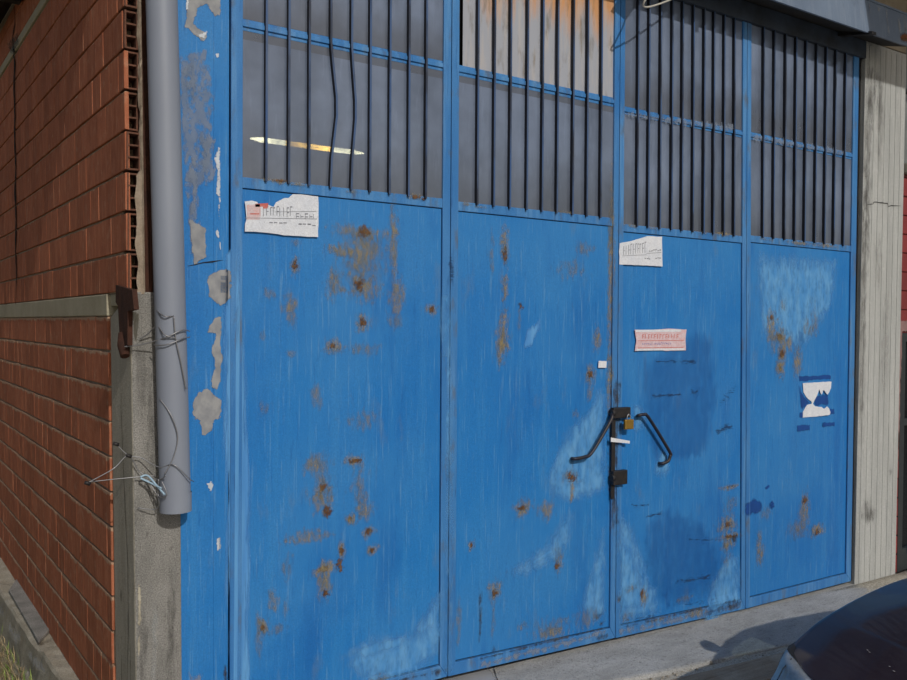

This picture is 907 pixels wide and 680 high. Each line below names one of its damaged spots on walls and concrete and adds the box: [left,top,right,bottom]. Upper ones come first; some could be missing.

crack [10,15,18,283]
peeling [180,0,221,264]
peeling [207,269,232,306]
rust [329,225,378,299]
rust [767,311,800,373]
peeling [192,317,223,435]
rust [308,460,333,519]
rust [721,518,738,548]
rust [316,545,344,597]